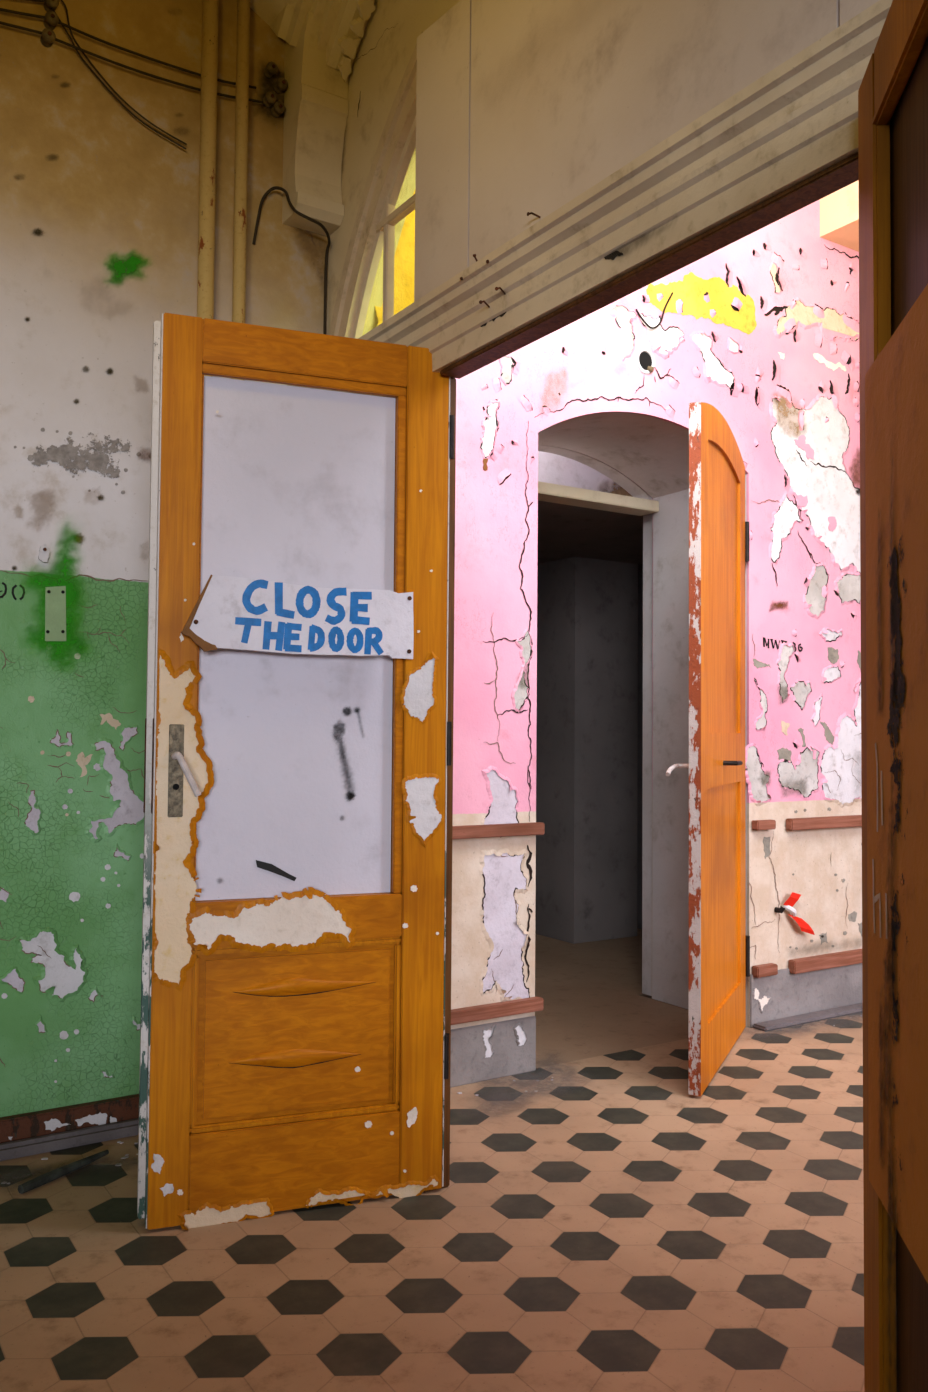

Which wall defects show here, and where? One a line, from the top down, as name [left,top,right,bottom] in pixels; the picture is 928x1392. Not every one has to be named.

peeling [607,262,859,390]
crack [480,242,860,998]
peeling [745,393,862,813]
peeling [23,790,43,835]
peeling [401,773,444,847]
peeling [478,766,532,1002]
peeling [0,927,105,1003]
peeling [34,1015,79,1062]